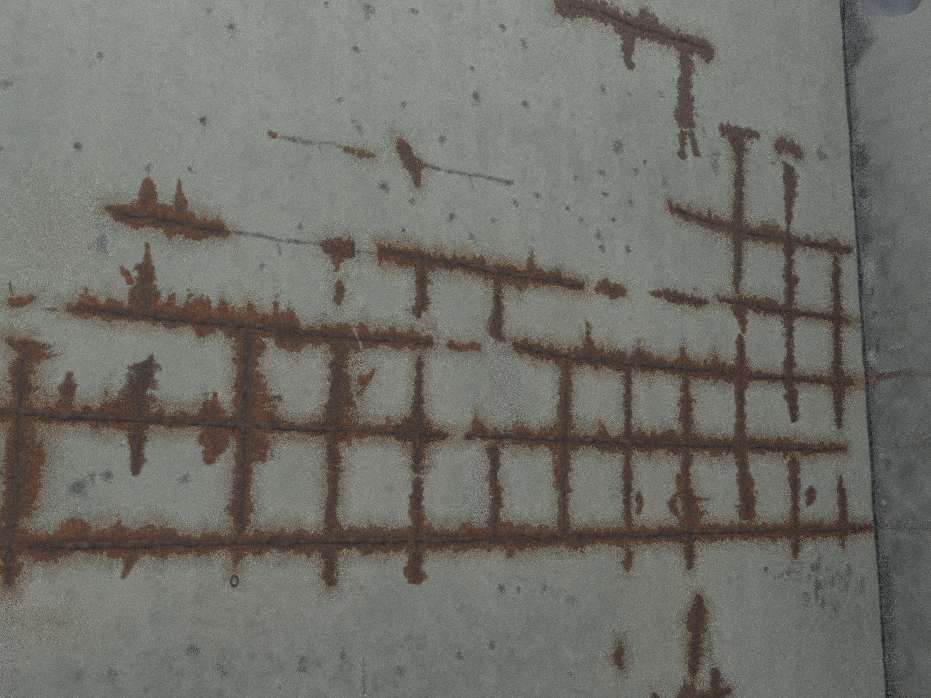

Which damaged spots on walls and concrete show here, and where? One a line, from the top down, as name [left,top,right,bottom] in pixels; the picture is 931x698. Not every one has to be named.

corrosion [555,0,714,160]
crack [425,163,513,186]
corrosion [0,121,901,597]
corrosion [677,593,732,698]